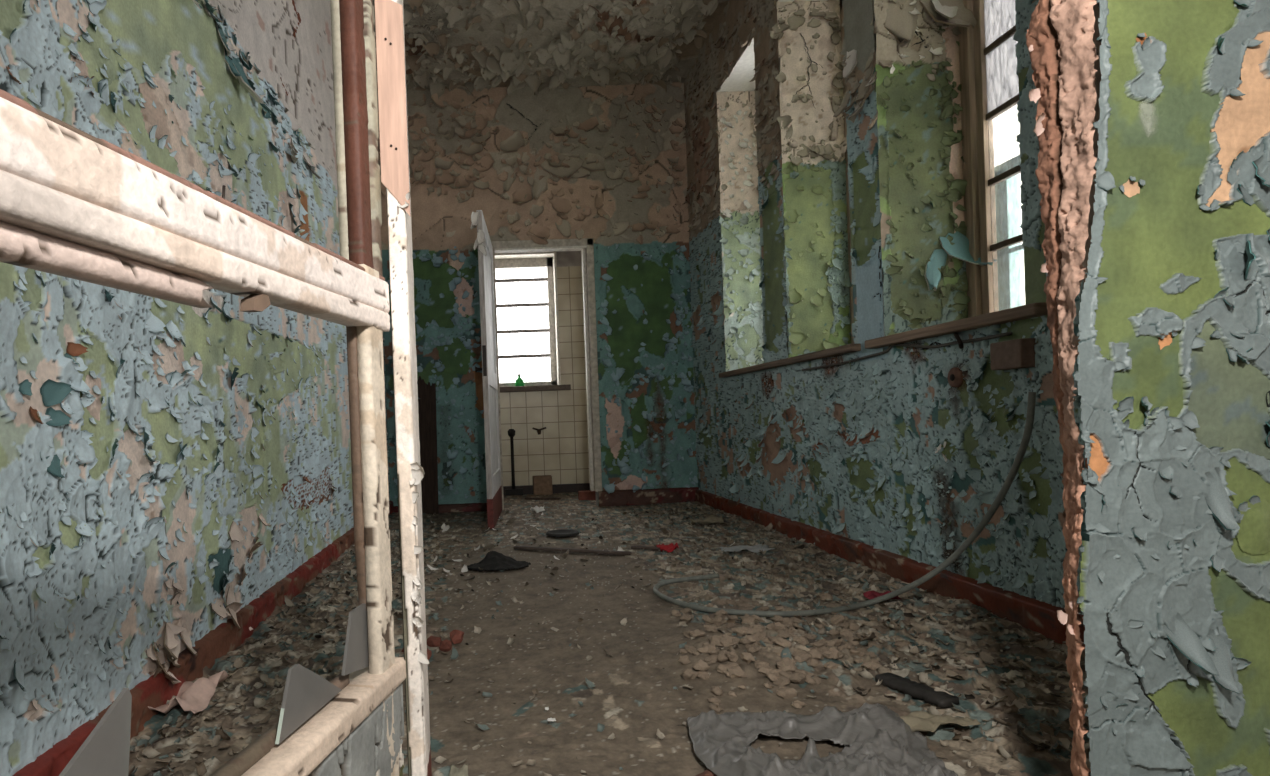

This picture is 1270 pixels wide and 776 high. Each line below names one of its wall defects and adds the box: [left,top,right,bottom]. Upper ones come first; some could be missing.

peeling [0,0,41,45]
peeling [6,66,42,107]
peeling [55,0,321,241]
peeling [13,268,46,310]
peeling [375,0,1270,776]
peeling [0,443,119,633]
peeling [18,289,337,684]
crack [1125,432,1156,522]
peeling [0,619,130,721]
crack [1106,613,1181,752]